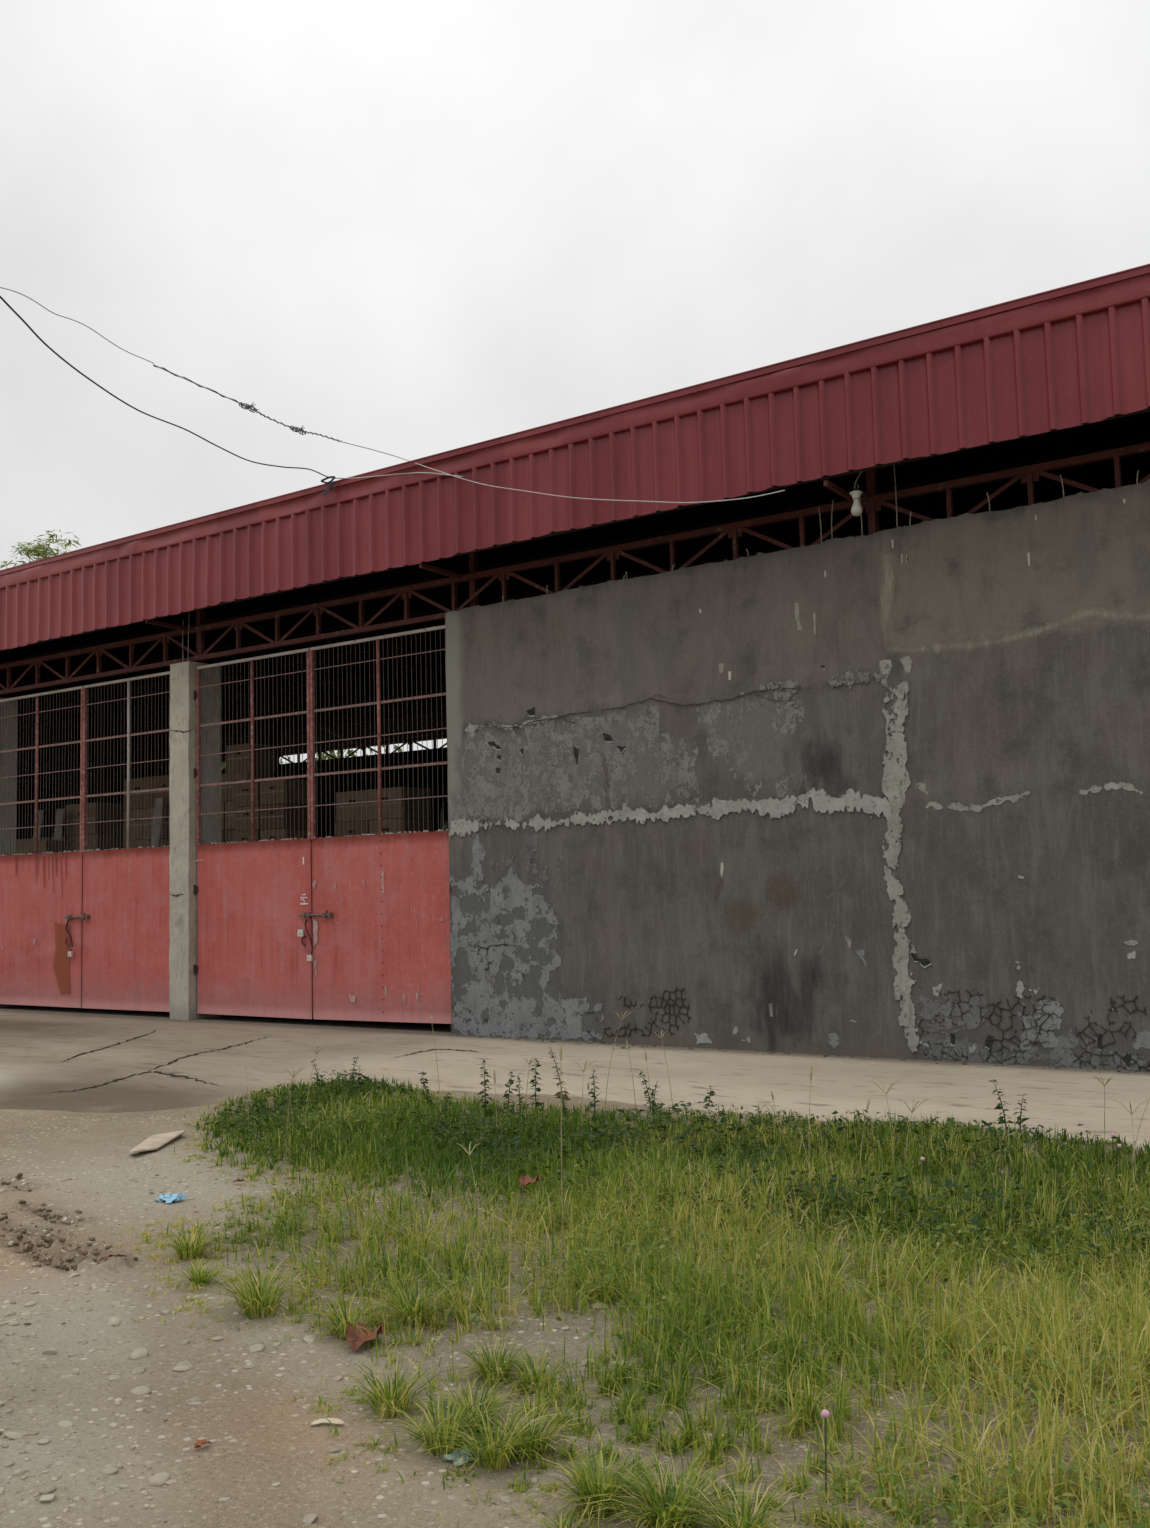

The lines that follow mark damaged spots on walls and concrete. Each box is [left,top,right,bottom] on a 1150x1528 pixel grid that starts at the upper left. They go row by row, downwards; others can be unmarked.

rust [53,923,70,993]
peeling [449,656,1150,1072]